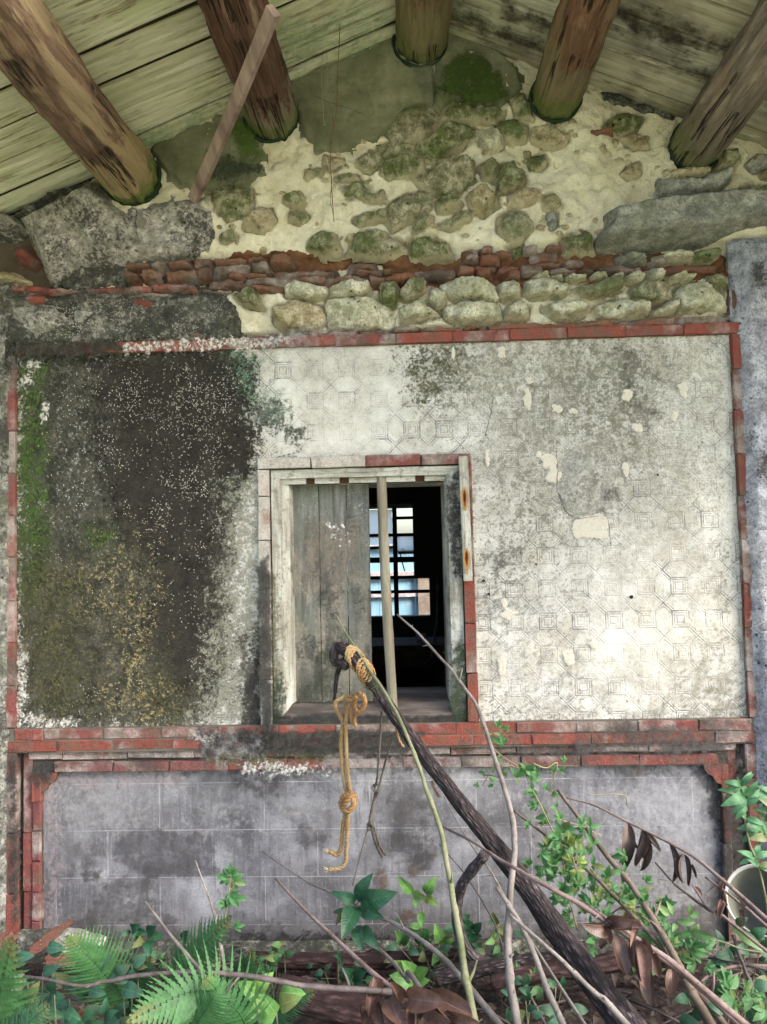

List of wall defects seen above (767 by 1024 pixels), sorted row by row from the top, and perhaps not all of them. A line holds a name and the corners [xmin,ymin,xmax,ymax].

flaking render [523,375,534,410]
flaking render [552,404,578,414]
flaking render [621,389,633,401]
flaking render [536,451,562,483]
corrosion [461,488,475,511]
flaking render [571,513,610,539]
damp [16,334,410,789]
damp [389,335,747,879]